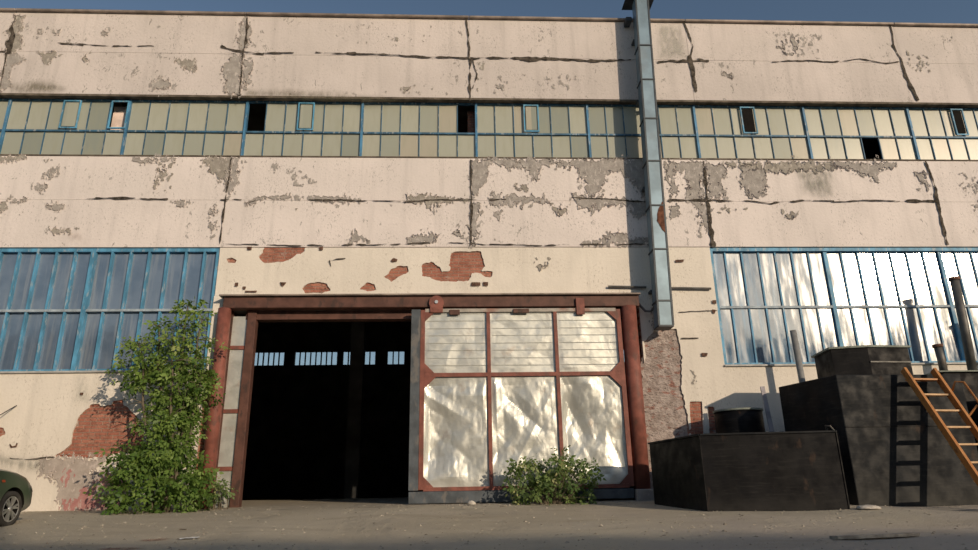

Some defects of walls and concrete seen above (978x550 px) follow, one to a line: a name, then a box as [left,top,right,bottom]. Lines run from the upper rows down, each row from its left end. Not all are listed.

crack [0,16,16,86]
crack [220,18,631,101]
crack [657,22,709,92]
crack [775,26,919,101]
spalling [247,247,305,263]
crack [219,158,555,266]
spalling [385,258,409,282]
peeling [406,154,649,286]
crack [572,161,949,248]
peeling [663,154,897,238]
spalling [641,307,716,489]
spalling [35,400,144,511]